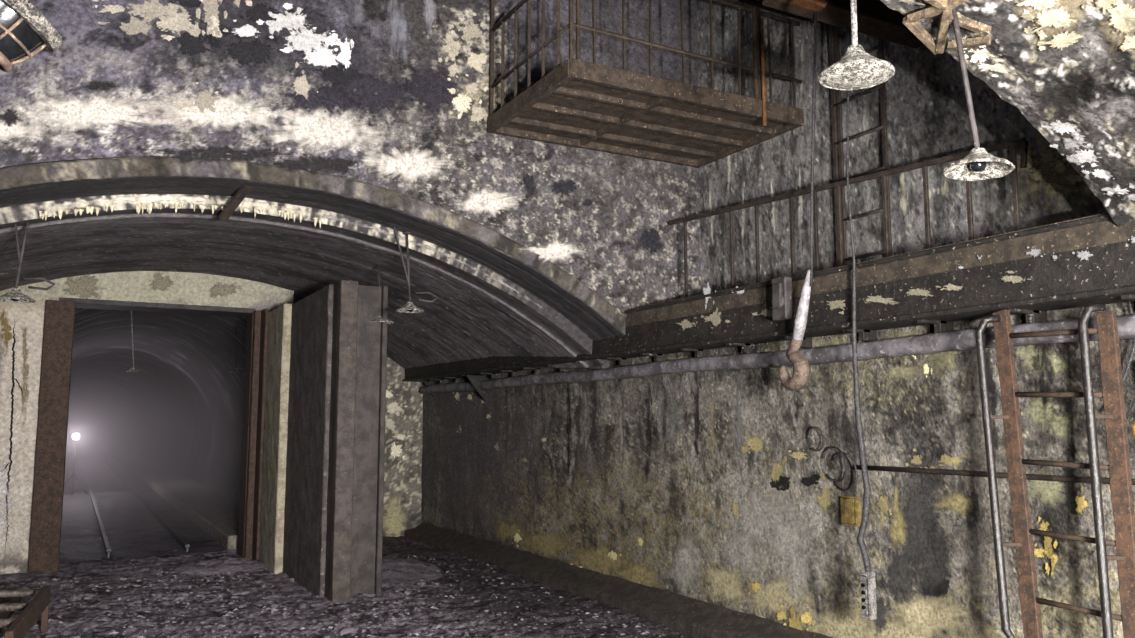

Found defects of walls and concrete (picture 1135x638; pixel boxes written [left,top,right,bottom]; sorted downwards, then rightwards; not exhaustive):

peeling [92,0,364,100]
peeling [172,82,220,113]
peeling [1072,248,1094,262]
leakage [566,383,589,473]
leakage [693,380,716,458]
leakage [985,349,999,455]
peeling [0,457,13,543]
leakage [495,521,662,587]